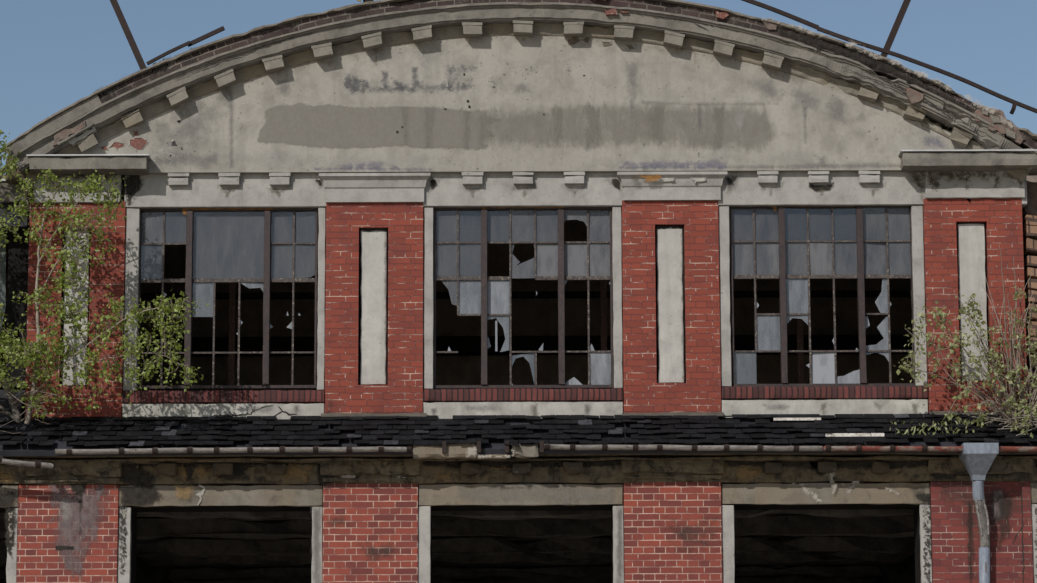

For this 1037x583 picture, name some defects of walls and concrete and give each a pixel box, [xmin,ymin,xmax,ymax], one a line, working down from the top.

spalling [53,120,97,146]
spalling [98,130,149,152]
spalling [974,106,1025,146]
water stain [466,447,515,469]
water stain [916,493,931,524]
water stain [50,475,103,576]
peeling [118,505,128,574]